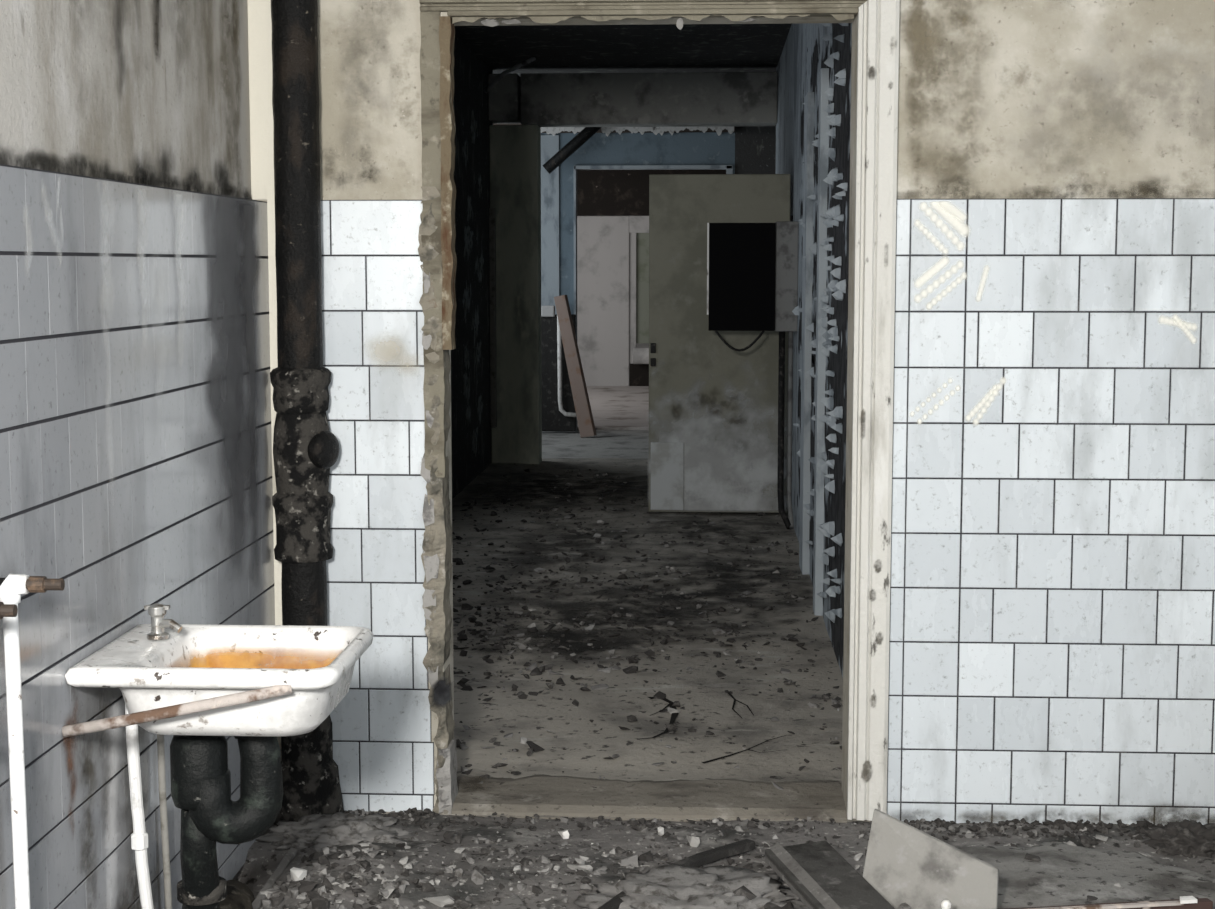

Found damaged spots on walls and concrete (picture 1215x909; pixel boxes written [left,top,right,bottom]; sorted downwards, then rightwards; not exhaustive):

flaking render [452,15,808,30]
damp [906,12,943,67]
flaking render [541,127,585,136]
flaking render [601,126,734,137]
damp [1110,184,1158,198]
peeling [659,14,865,667]
damp [0,153,258,555]
flaking render [418,174,484,814]
peeling [862,761,871,781]